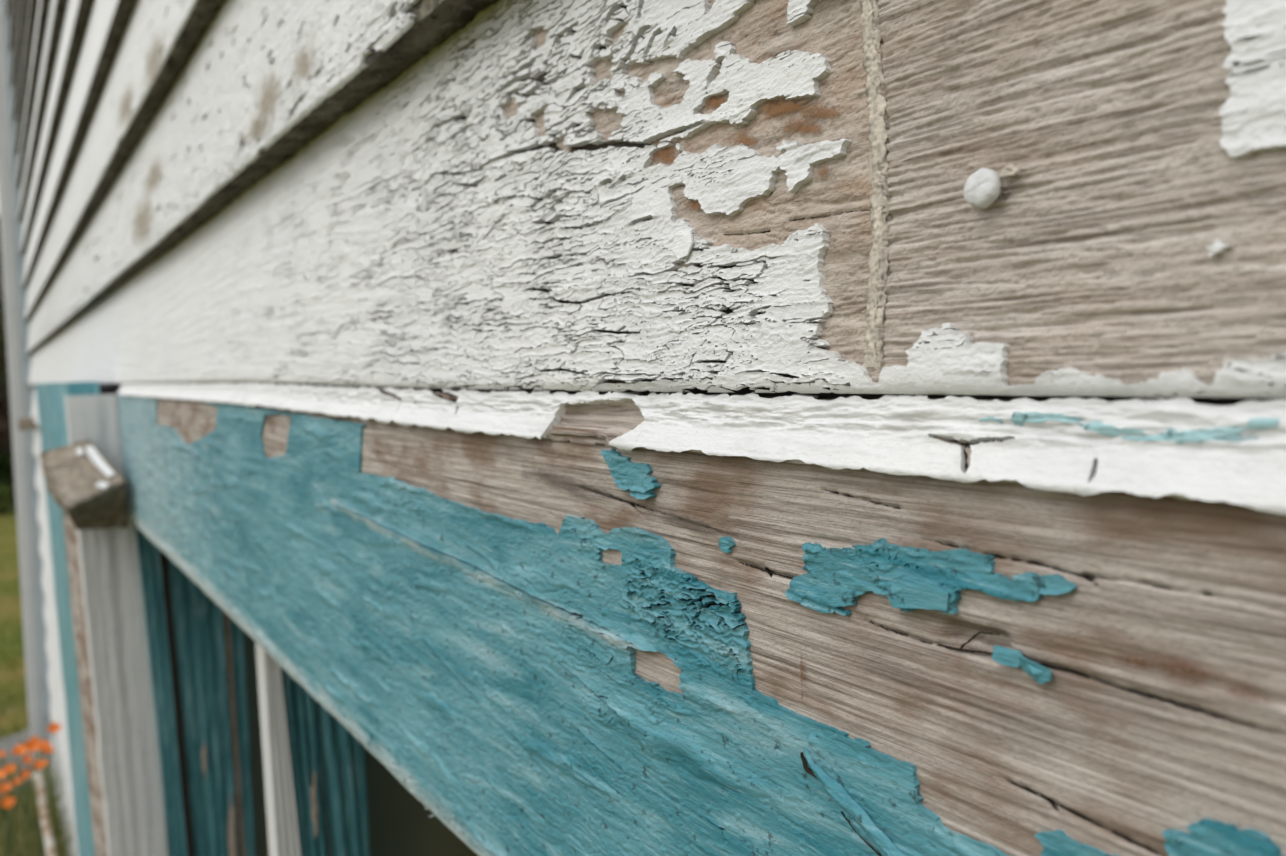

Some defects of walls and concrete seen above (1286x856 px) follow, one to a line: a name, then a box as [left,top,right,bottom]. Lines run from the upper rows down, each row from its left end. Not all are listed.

peeling [428,0,1286,400]
crack [825,489,902,510]
crack [922,538,1220,599]
peeling [152,397,1286,856]
crack [867,620,1000,655]
crack [1035,662,1279,734]
crack [1007,779,1160,856]